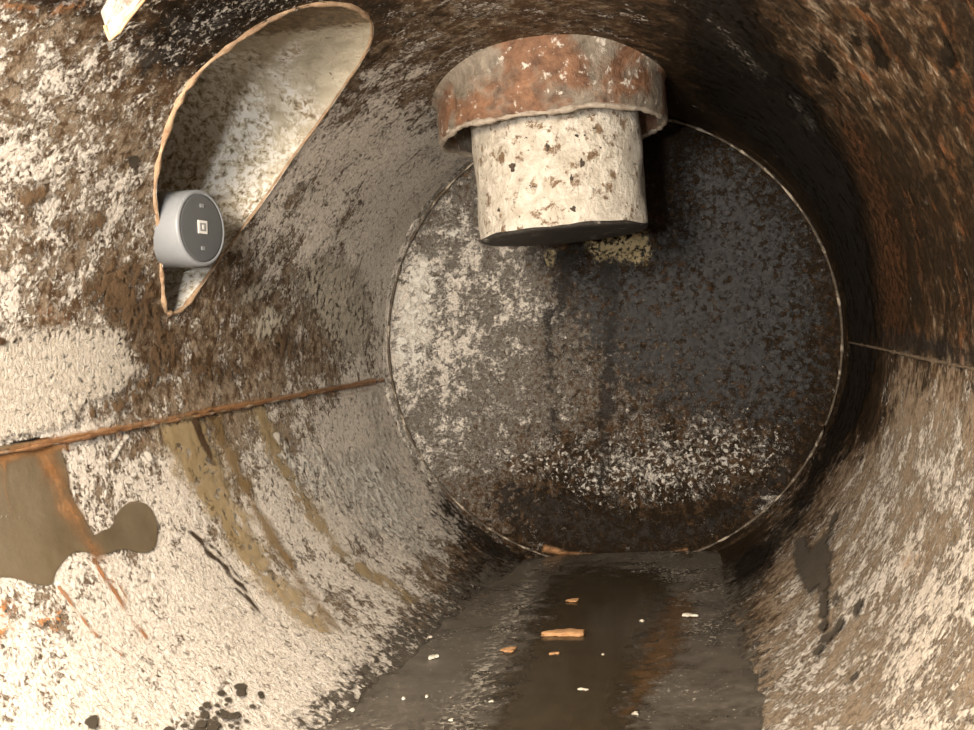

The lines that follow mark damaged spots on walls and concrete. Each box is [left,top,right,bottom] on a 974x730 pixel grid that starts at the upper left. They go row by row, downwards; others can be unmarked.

rust [0,600,18,637]
peeling [0,324,158,586]
rust [12,378,377,465]
crack [188,531,267,619]
leakage [157,416,337,633]
leakage [249,386,541,730]
peeling [793,512,862,657]
spalling [163,683,265,730]